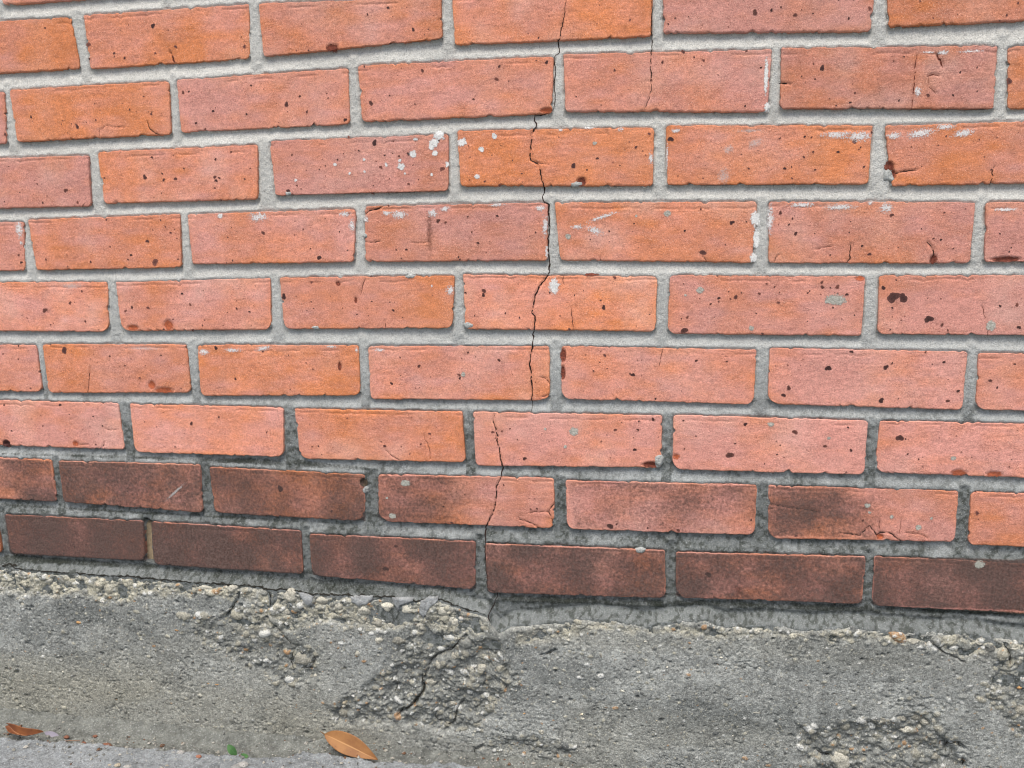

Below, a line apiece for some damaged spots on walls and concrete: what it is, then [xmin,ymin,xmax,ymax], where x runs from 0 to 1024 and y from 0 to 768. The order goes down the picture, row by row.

crack [529,3,566,412]
damp [2,453,1024,616]
spalling [0,570,512,734]
crack [389,630,465,724]